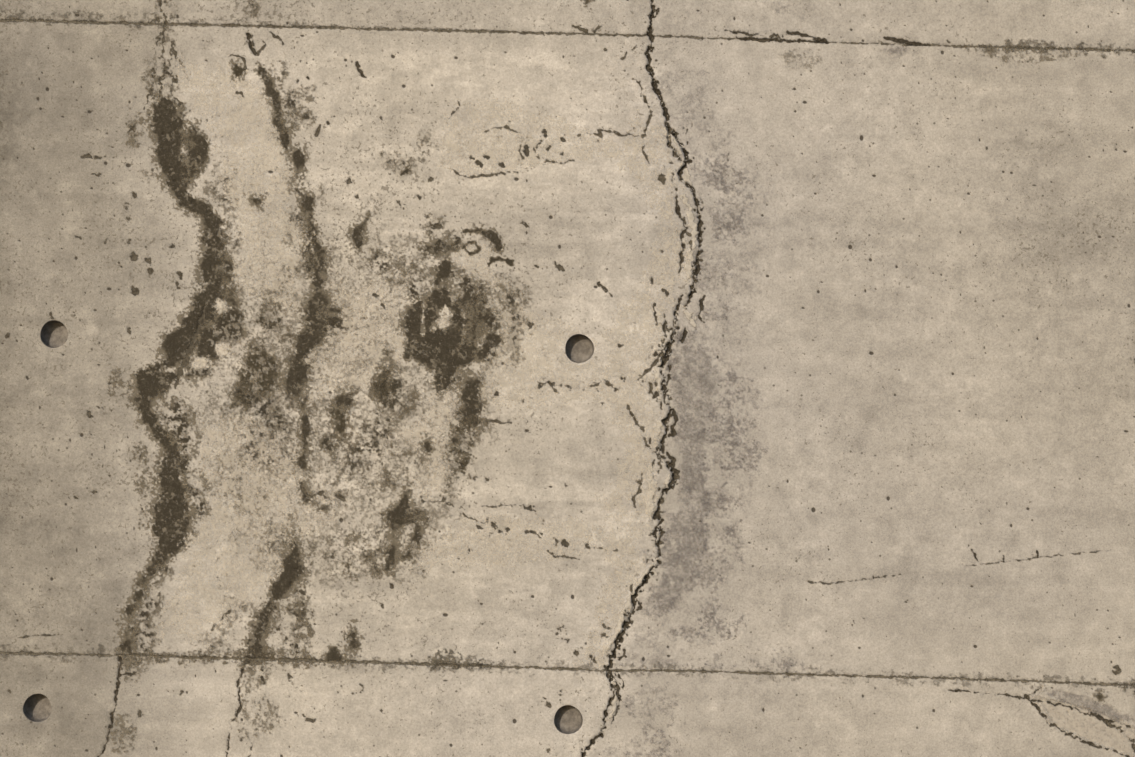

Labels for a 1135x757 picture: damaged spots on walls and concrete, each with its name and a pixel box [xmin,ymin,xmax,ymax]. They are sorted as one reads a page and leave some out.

water stain [108,0,529,670]
crack [581,0,706,757]
crack [808,574,901,585]
crack [971,549,1098,566]
crack [97,657,136,757]
crack [225,669,265,757]